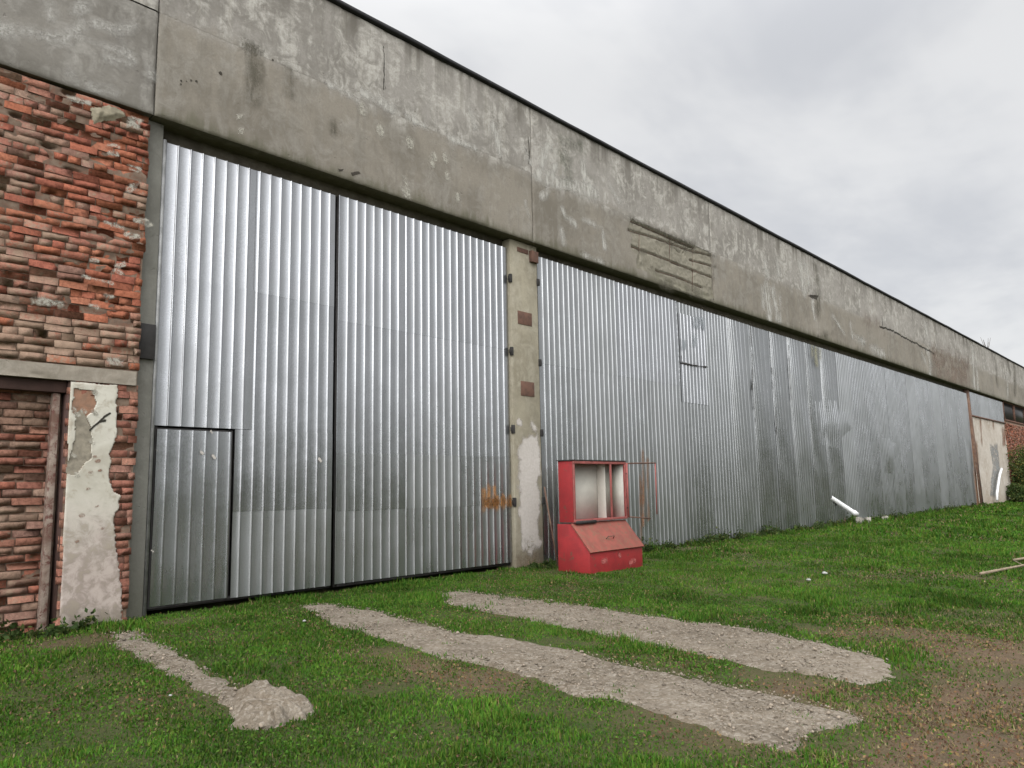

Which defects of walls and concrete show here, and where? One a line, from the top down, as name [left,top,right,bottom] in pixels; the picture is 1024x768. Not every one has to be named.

spalling [628,219,714,301]
crack [879,322,935,355]
peeling [66,388,102,477]